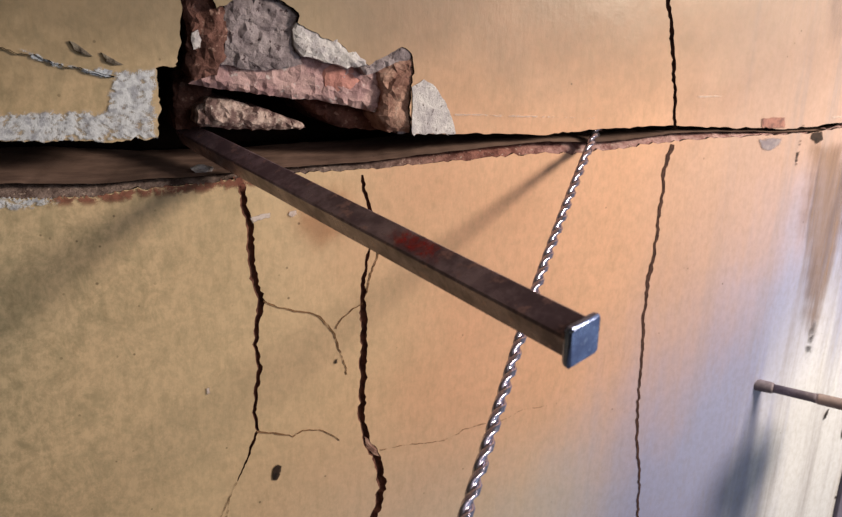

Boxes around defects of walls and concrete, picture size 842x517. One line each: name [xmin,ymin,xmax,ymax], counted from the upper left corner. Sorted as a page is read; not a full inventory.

spalling [0,0,456,143]
spalling [0,197,51,210]
crack [0,146,483,517]
crack [243,0,842,517]
leakage [807,148,842,351]